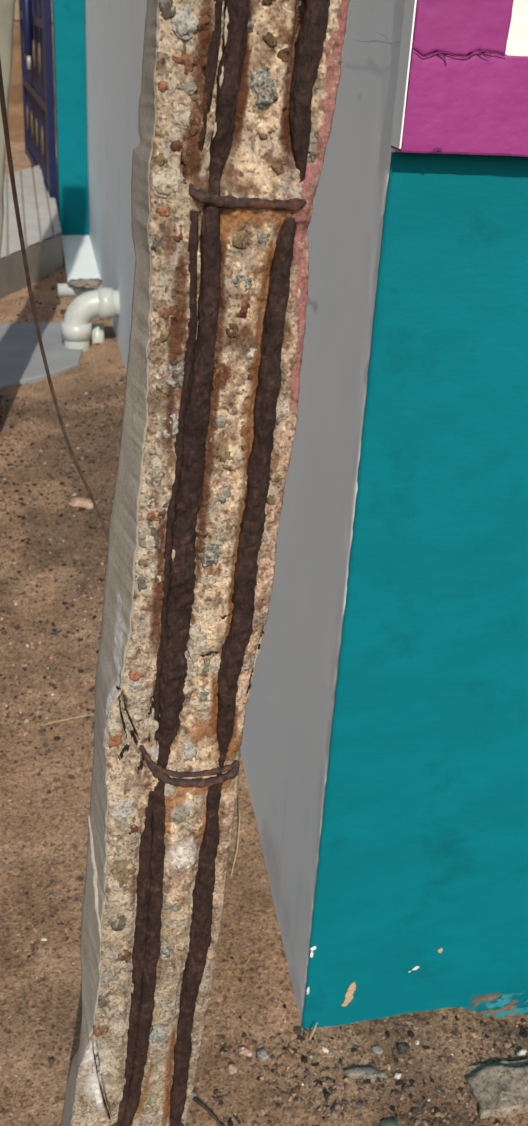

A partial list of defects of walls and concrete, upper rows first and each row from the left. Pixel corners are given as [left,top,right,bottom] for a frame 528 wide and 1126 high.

rust [182,0,213,192]
rust [232,41,249,146]
rust [280,0,301,163]
crack [354,32,507,66]
rust [163,257,187,447]
rust [197,207,280,574]
rust [151,520,166,647]
spalling [71,0,350,1126]
crack [116,686,154,774]
rust [165,781,228,840]
peeling [342,981,356,1007]
peeling [475,992,528,1019]